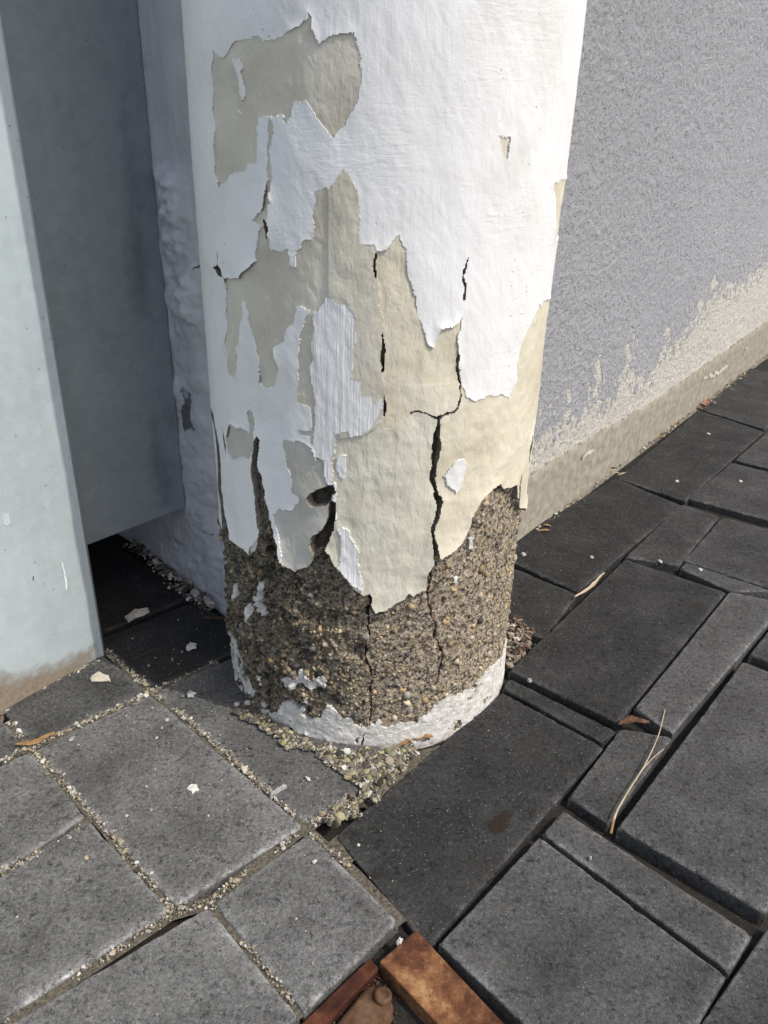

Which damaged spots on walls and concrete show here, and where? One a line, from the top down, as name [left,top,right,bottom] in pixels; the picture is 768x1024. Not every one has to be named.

crack [371,253,379,278]
crack [379,333,387,371]
spalling [190,13,768,750]
crack [425,416,441,668]
crack [362,594,373,741]